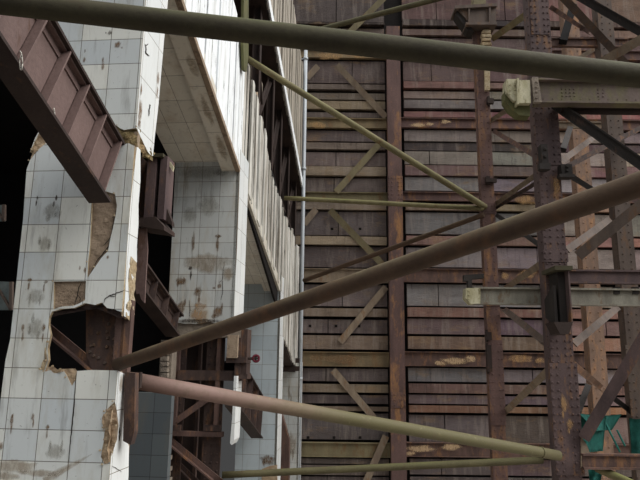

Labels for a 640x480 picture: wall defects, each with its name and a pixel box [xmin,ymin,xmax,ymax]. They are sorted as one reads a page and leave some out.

spalling [116,124,155,161]
spalling [52,192,137,320]
spalling [38,340,77,385]
spalling [99,400,117,465]